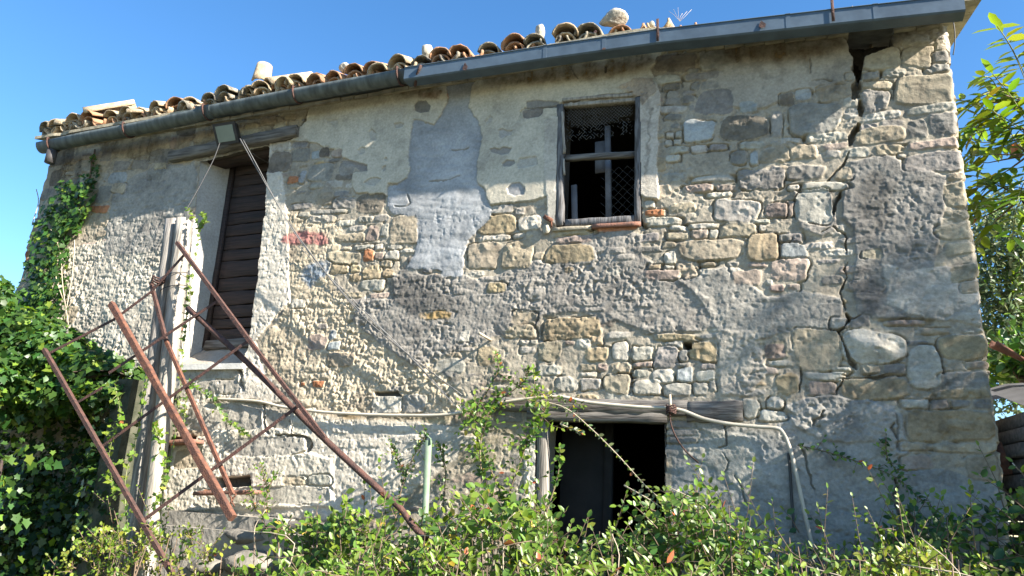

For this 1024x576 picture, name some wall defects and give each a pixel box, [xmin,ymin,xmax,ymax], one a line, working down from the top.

peeling [266,82,538,280]
flaking render [534,324,719,395]
flaking render [651,49,718,169]
crack [797,51,908,490]